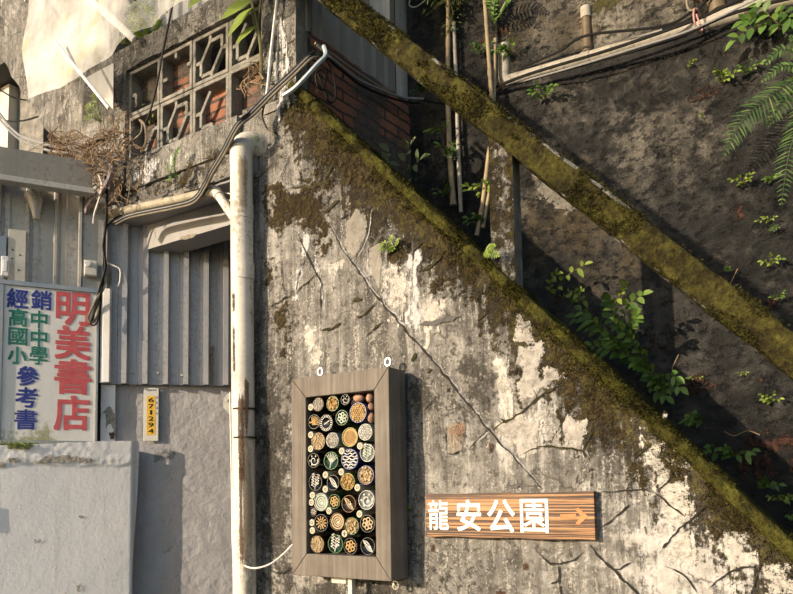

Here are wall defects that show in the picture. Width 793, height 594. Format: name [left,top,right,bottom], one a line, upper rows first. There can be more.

leakage [550,5,793,103]
crack [253,157,598,489]
flaking render [513,313,567,401]
rust [238,377,249,563]
flaking render [489,414,541,459]
flaking render [562,414,588,448]
crack [601,471,760,594]